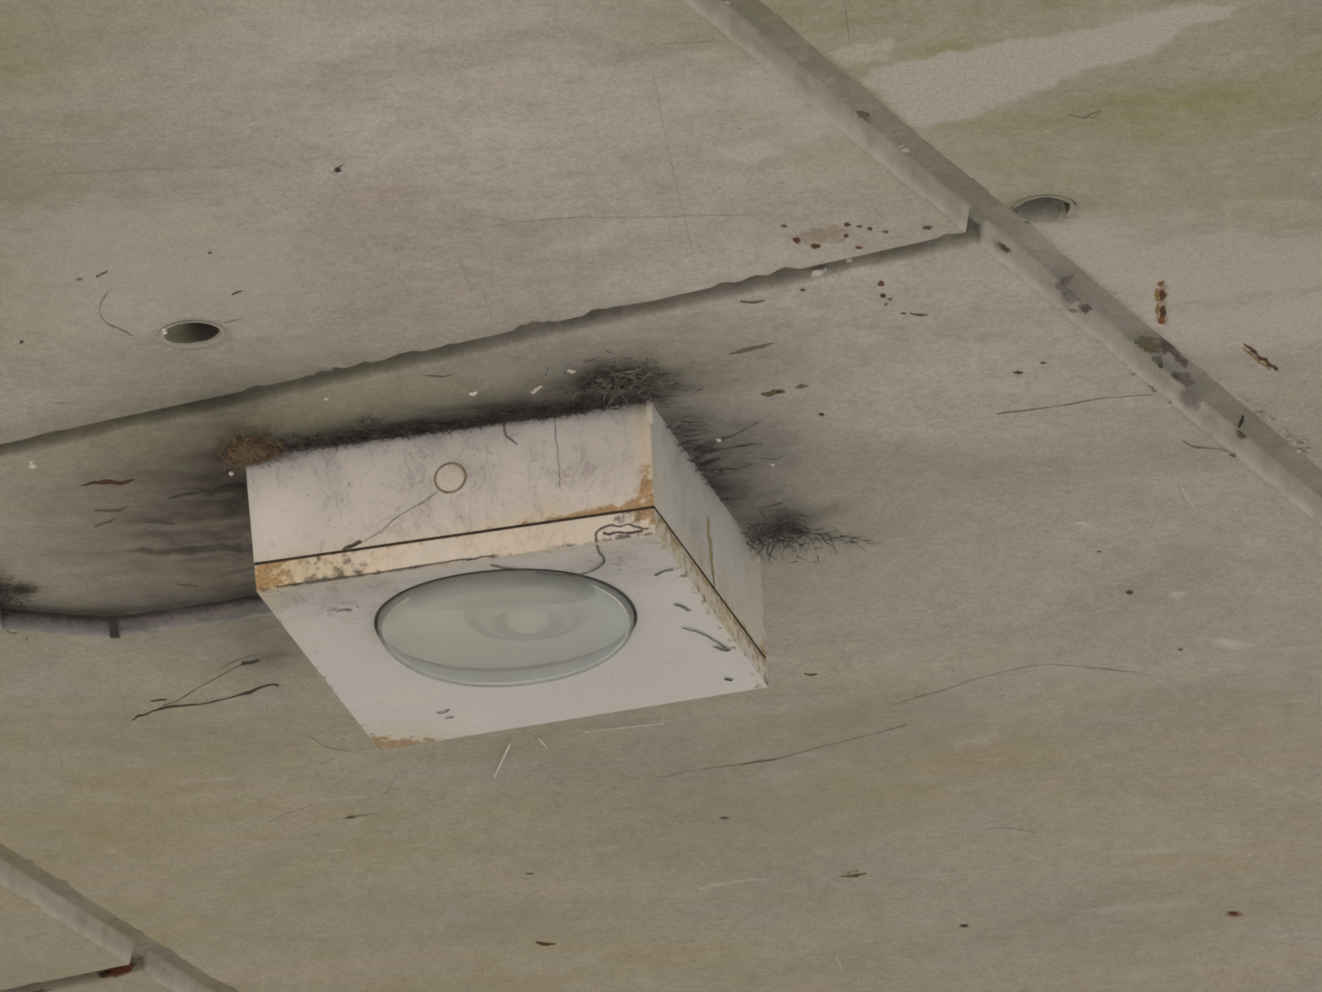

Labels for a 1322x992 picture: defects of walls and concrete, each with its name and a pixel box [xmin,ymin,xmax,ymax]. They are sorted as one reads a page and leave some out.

leakage [657,0,1260,173]
corrosion [1155,281,1166,324]
corrosion [1243,344,1278,371]
crack [132,659,279,721]
corrosion [98,964,135,978]